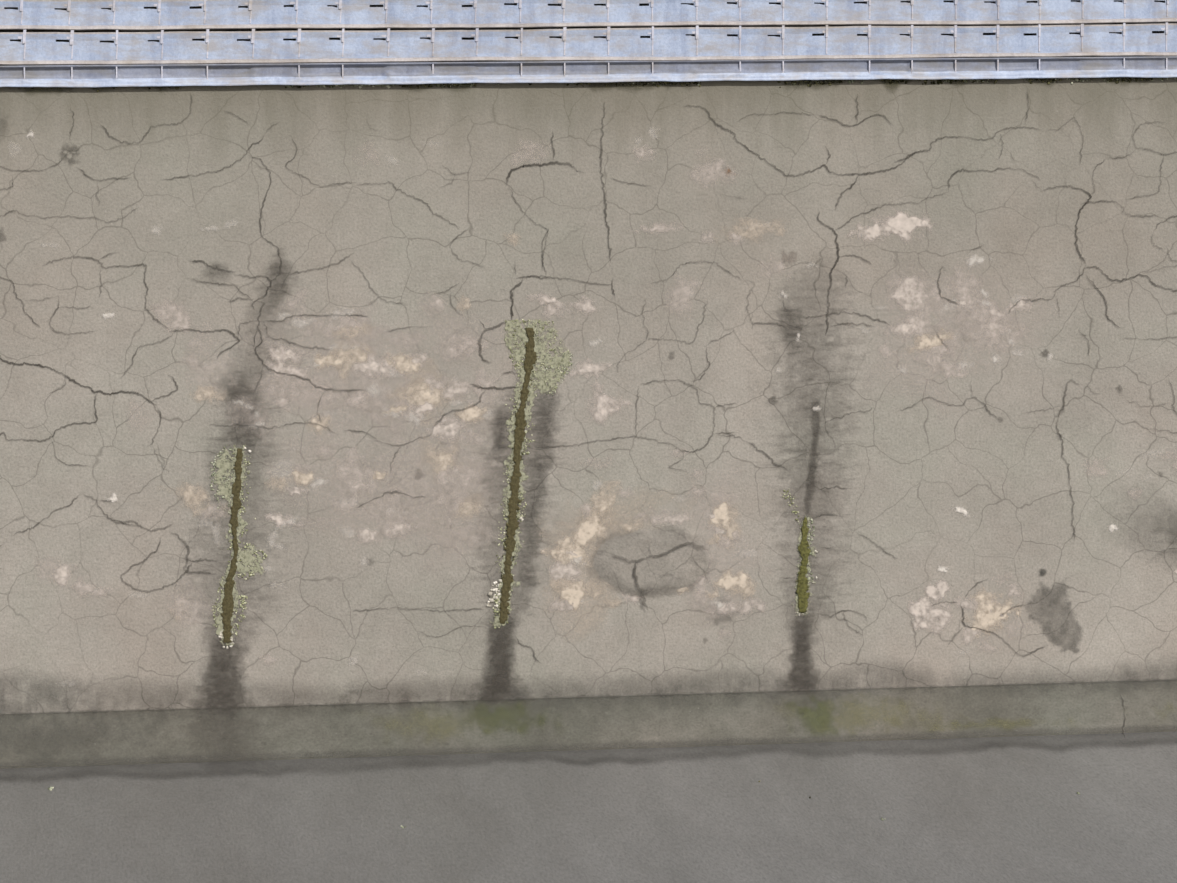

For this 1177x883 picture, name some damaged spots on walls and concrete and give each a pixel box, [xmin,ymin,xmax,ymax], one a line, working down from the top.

crack [89,257,353,391]
crack [494,276,531,328]
crack [506,151,560,179]
crack [601,150,611,254]
crack [708,113,780,170]
crack [817,216,847,332]
crack [817,136,954,189]
crack [1075,188,1176,292]
crack [0,358,177,442]
crack [479,356,515,390]
peeling [909,566,1021,642]